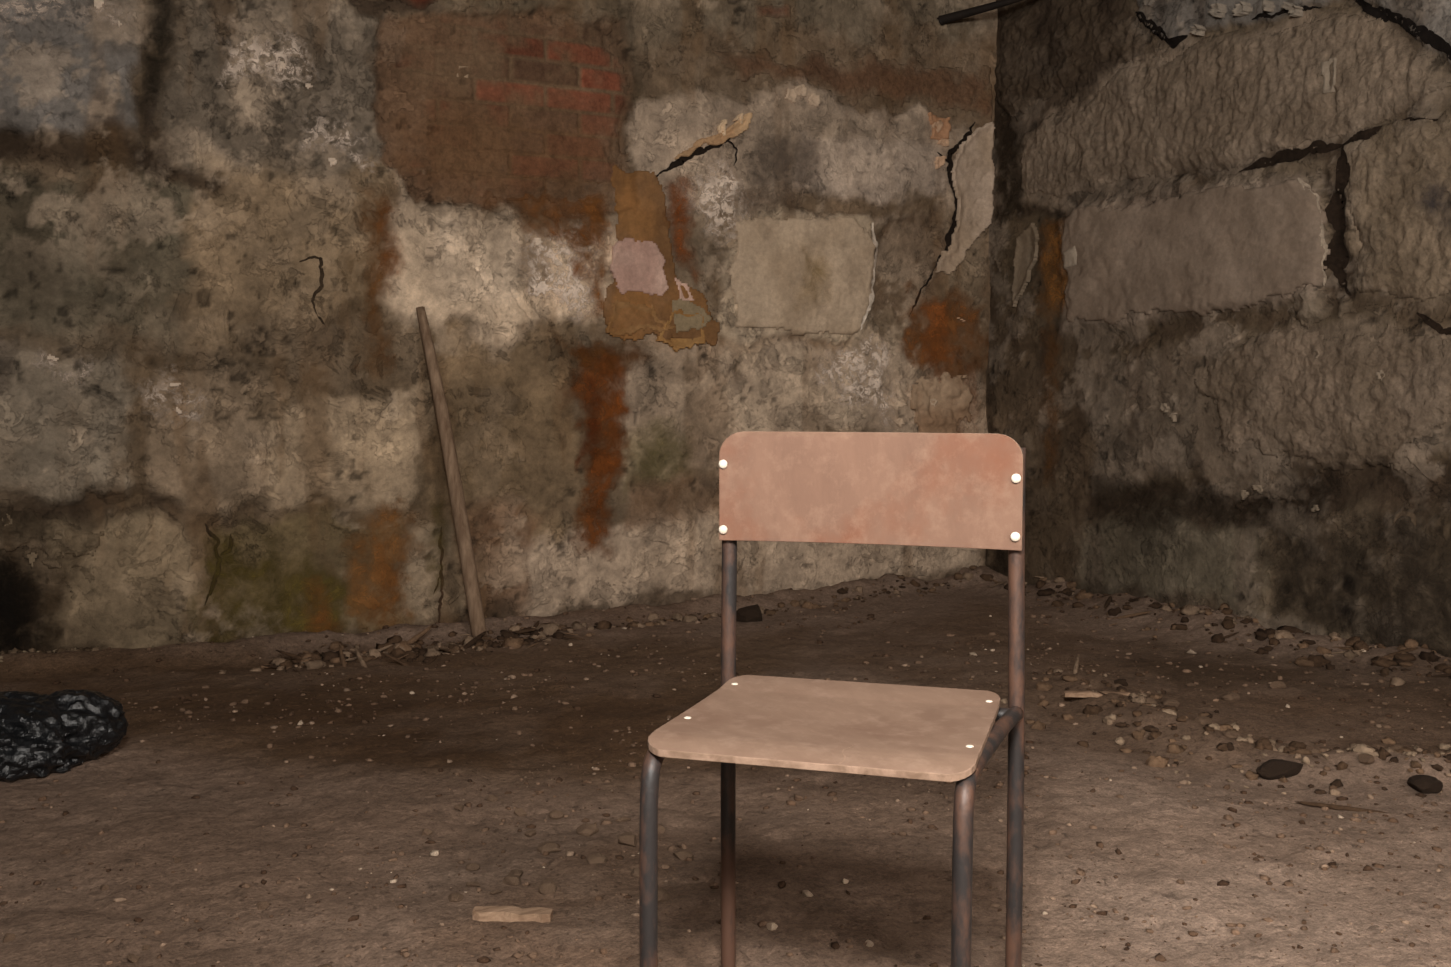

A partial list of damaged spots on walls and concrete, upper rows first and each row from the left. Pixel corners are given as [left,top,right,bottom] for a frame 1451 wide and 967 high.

peeling [603,165,720,352]
crack [656,138,738,177]
flaking render [674,112,753,160]
crack [909,122,975,316]
rust [904,292,988,375]
spalling [711,0,1451,307]
rust [572,344,642,549]
leakage [0,560,65,654]